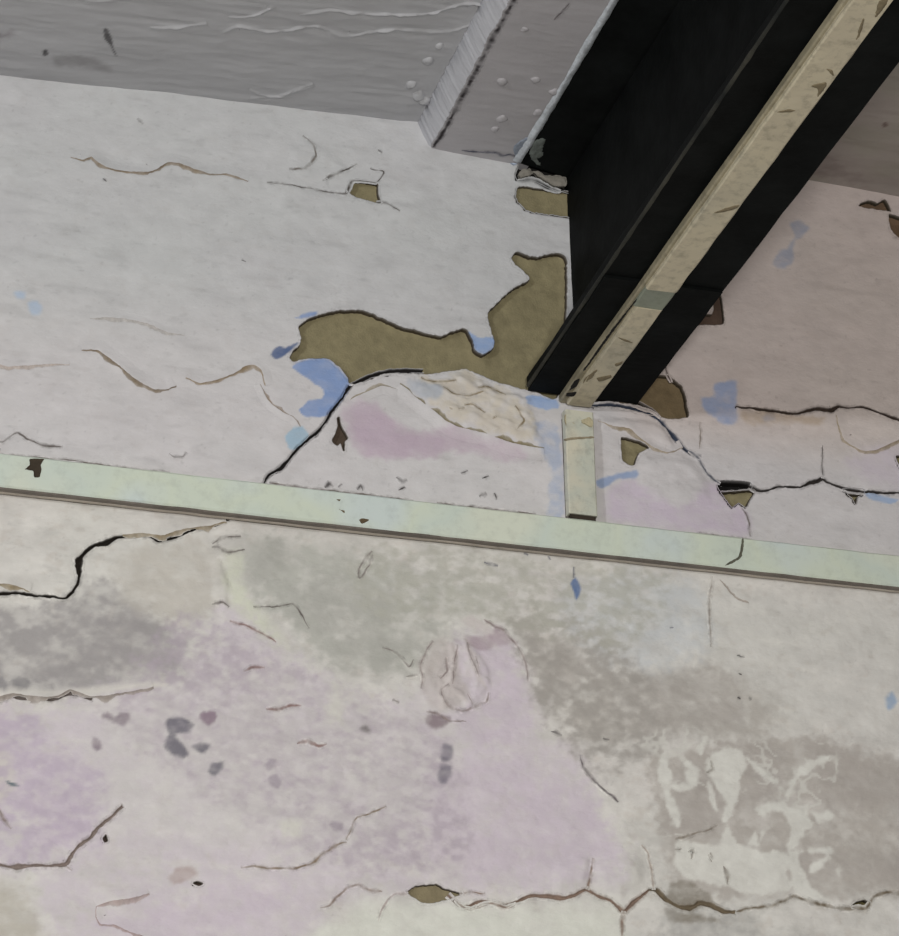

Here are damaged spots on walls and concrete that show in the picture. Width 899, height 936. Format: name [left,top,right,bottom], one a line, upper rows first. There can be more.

flaking render [346,178,383,206]
flaking render [513,137,569,218]
flaking render [857,198,899,239]
flaking render [697,293,727,328]
flaking render [185,250,570,518]
crack [263,368,527,484]
crack [592,401,721,485]
crack [735,403,899,423]
crack [0,520,245,602]
water stain [0,520,899,936]
crack [0,803,126,873]
crack [445,844,899,936]